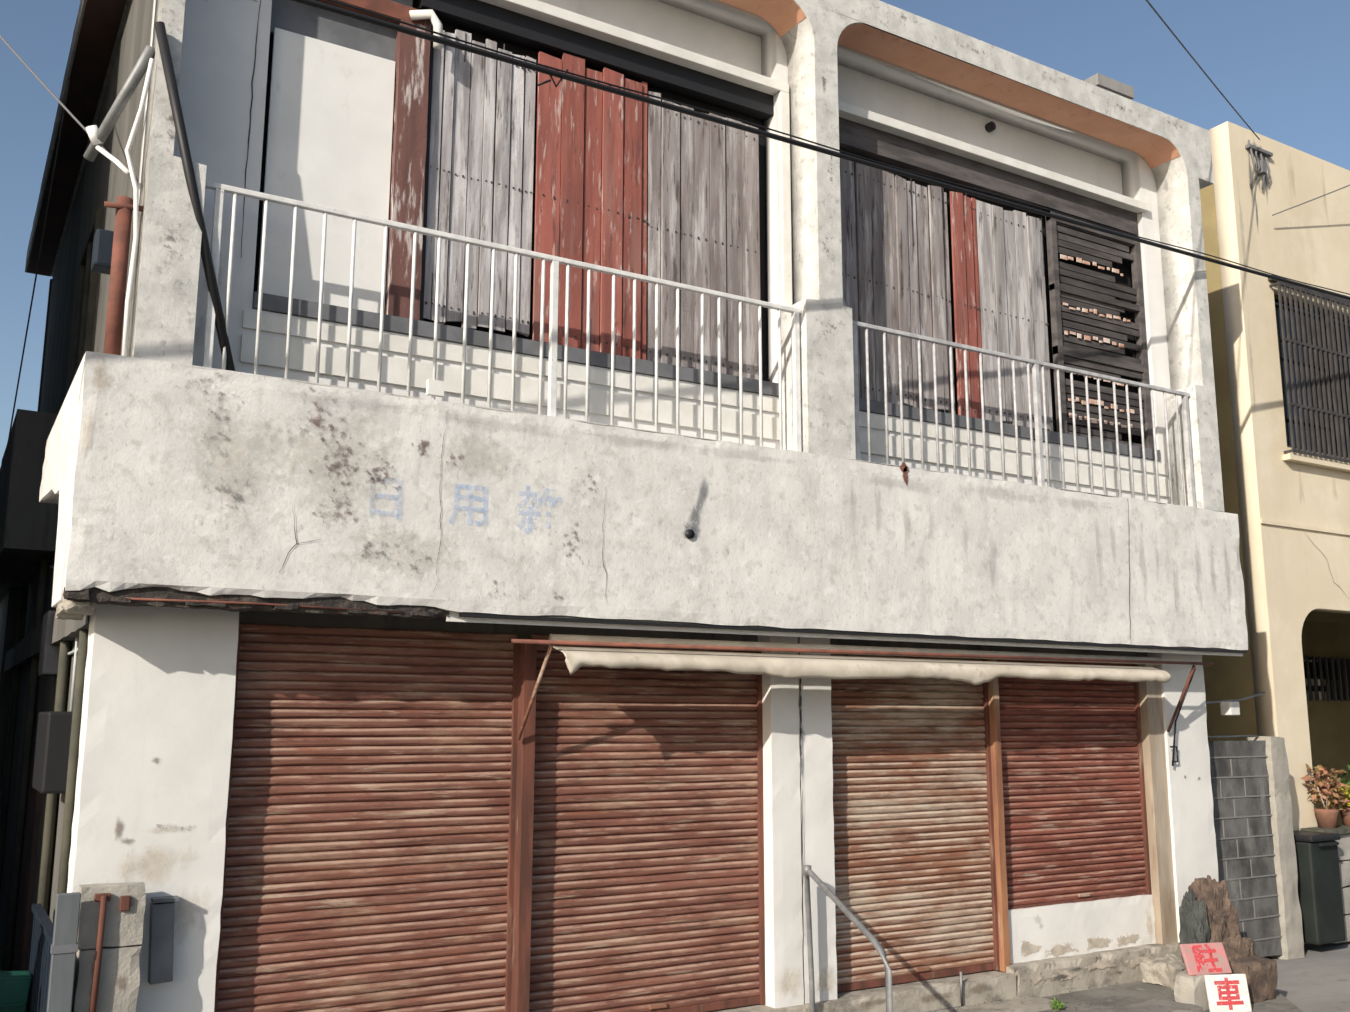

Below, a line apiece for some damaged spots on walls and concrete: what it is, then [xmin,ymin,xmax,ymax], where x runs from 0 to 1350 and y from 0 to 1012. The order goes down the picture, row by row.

crack [279,509,320,572]
spalling [55,587,450,620]